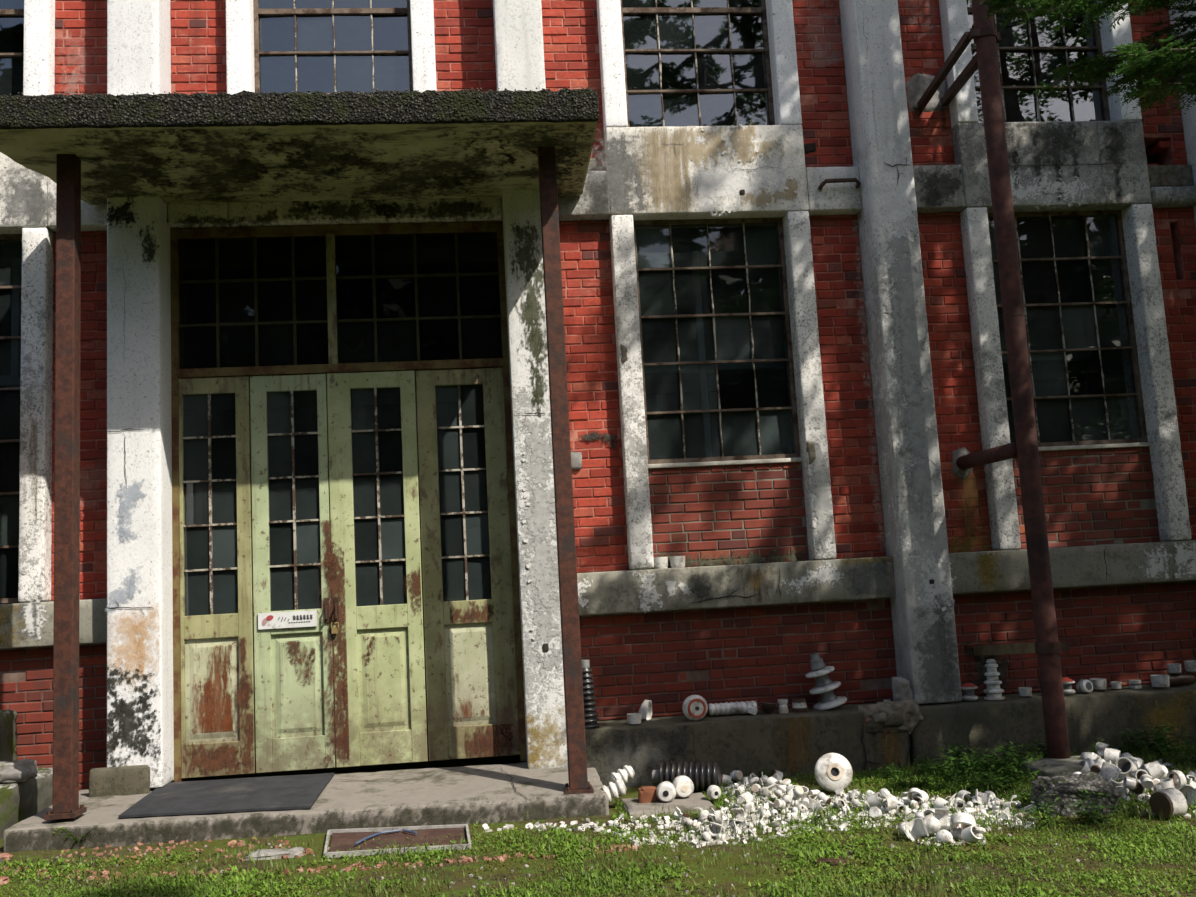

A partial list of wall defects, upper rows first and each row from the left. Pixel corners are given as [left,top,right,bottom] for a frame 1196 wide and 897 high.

water stain [24,179,46,225]
water stain [64,124,594,207]
water stain [607,127,691,213]
water stain [1005,122,1083,201]
water stain [1101,122,1131,196]
corrosion [320,520,350,767]
corrosion [450,600,494,624]
water stain [107,611,161,772]
corrosion [183,638,254,776]